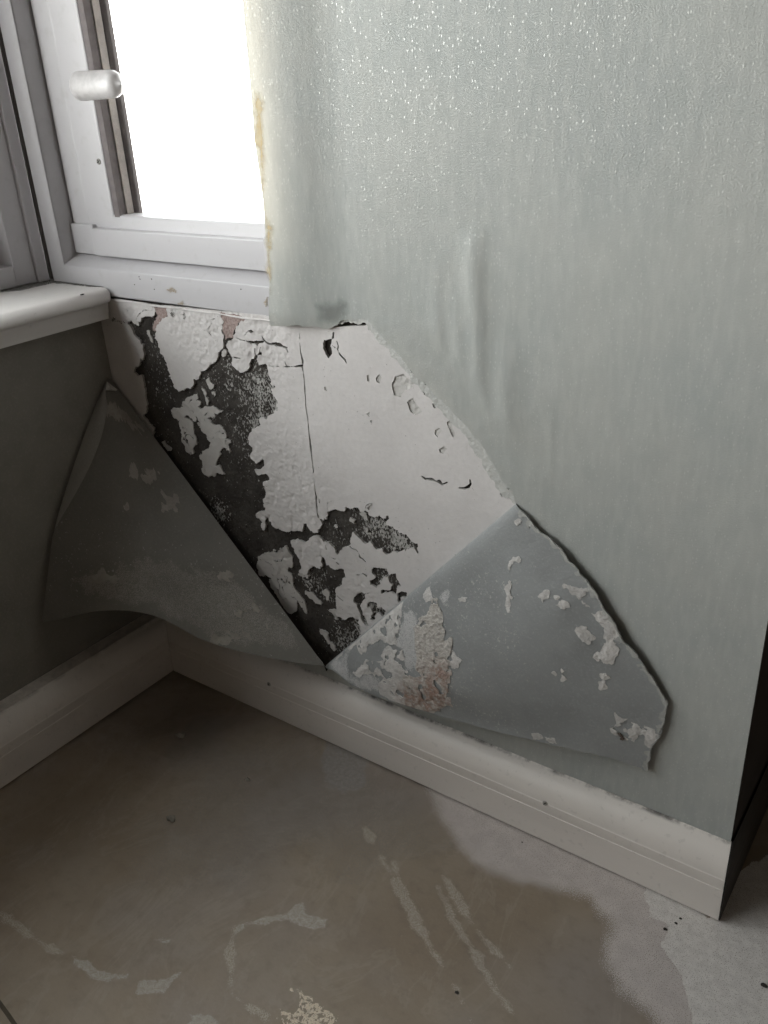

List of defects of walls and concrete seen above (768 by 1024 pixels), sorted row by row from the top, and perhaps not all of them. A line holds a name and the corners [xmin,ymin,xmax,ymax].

spalling [129,304,418,671]
spalling [367,374,436,415]
spalling [435,421,455,453]
leakage [0,911,181,995]
leakage [223,902,337,1024]
leakage [378,855,444,967]
leakage [422,786,768,1024]